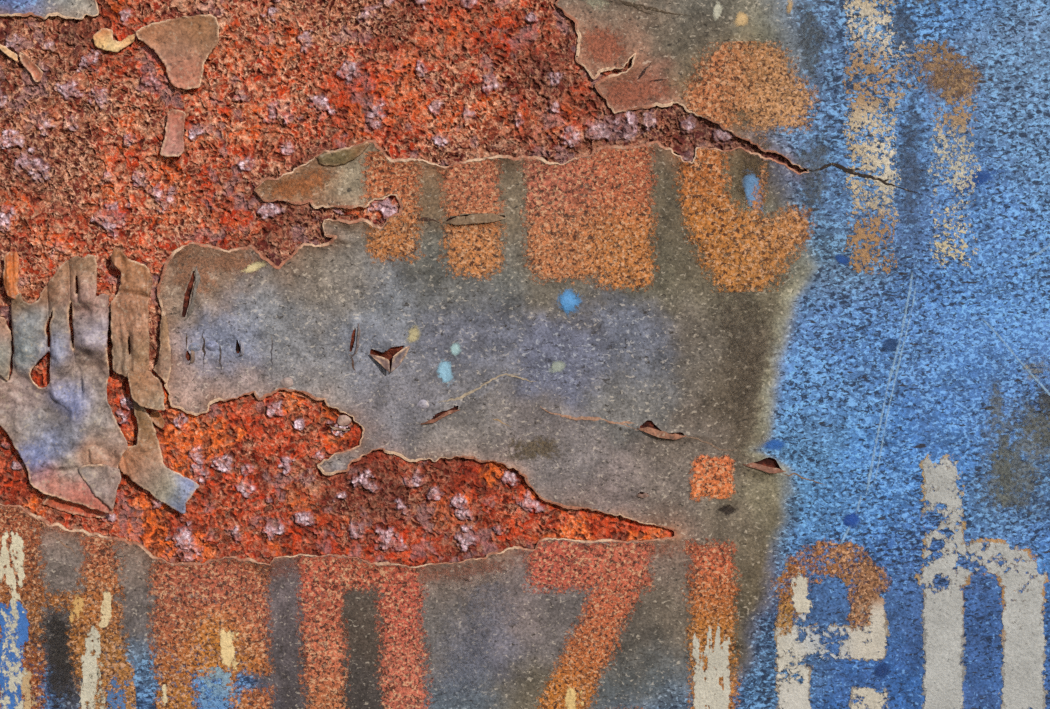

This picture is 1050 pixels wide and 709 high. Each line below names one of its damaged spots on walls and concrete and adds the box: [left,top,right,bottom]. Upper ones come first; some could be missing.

rust [0,0,827,568]
crack [802,163,924,195]